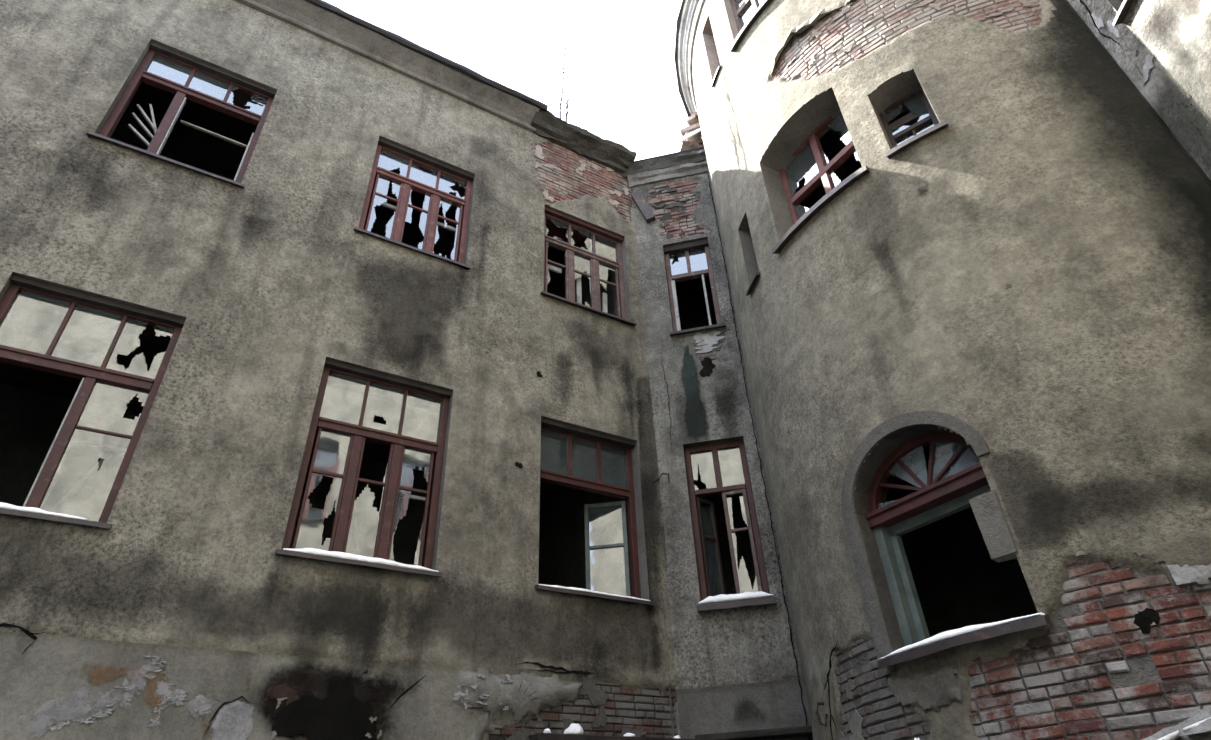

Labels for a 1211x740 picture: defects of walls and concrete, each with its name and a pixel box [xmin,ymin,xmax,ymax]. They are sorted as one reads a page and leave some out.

flaking render [771,0,1043,82]
peeling [1091,12,1121,38]
flaking render [530,142,633,224]
flaking render [647,179,710,240]
leakage [1044,0,1211,325]
leakage [361,263,459,362]
leakage [681,346,707,437]
flaking render [693,330,726,377]
crack [0,623,45,654]
peeling [30,655,215,735]
flaking render [835,639,931,740]
flaking render [968,560,1211,740]